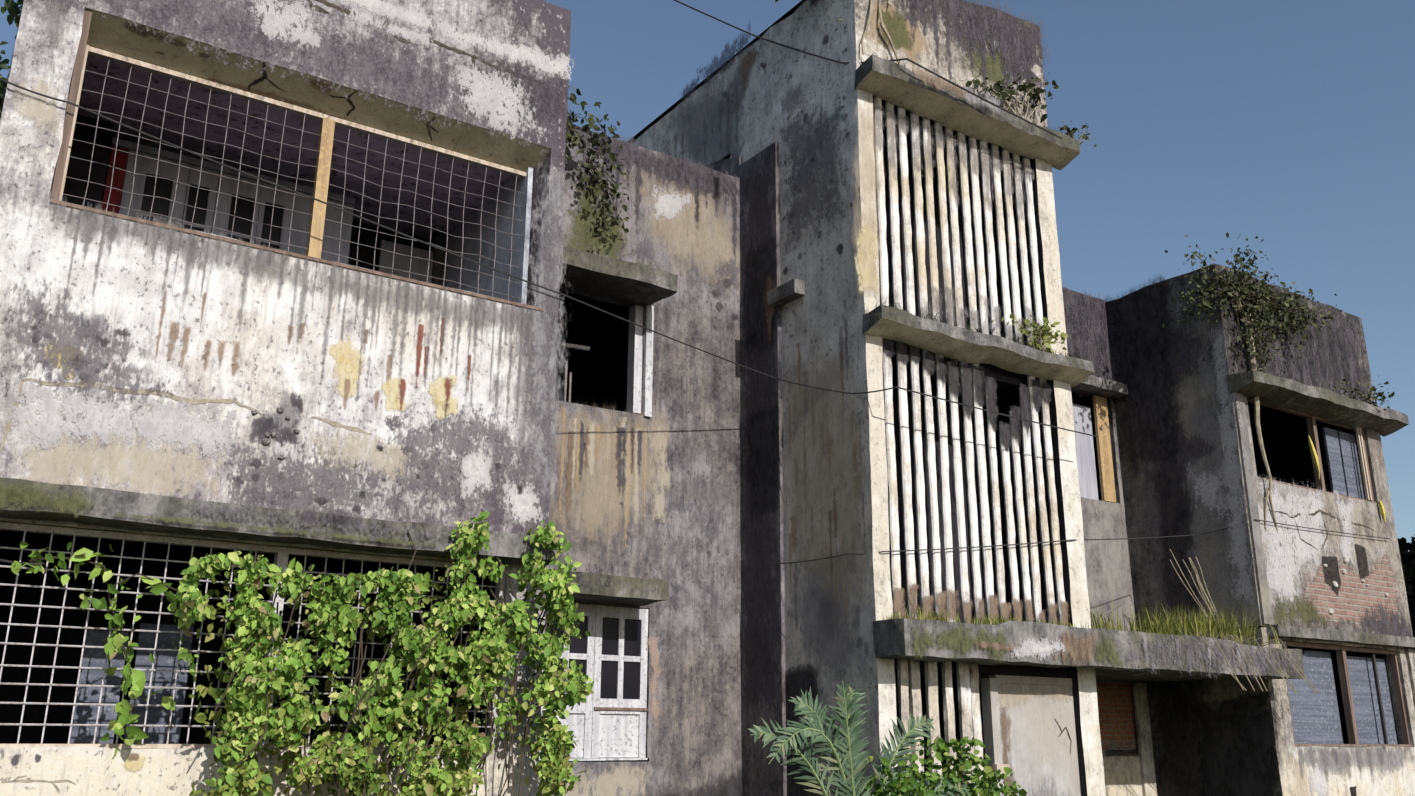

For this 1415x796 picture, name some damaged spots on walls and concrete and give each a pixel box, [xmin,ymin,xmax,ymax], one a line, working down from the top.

leakage [79,0,574,151]
crack [307,0,545,84]
corrosion [157,290,190,363]
corrosion [204,341,239,373]
leakage [1,176,565,546]
corrosion [375,317,445,409]
corrosion [445,355,471,410]
leakage [583,24,865,715]
leakage [1062,277,1364,679]
crack [1268,509,1373,550]
peeling [1257,478,1401,630]
crack [1,775,76,792]